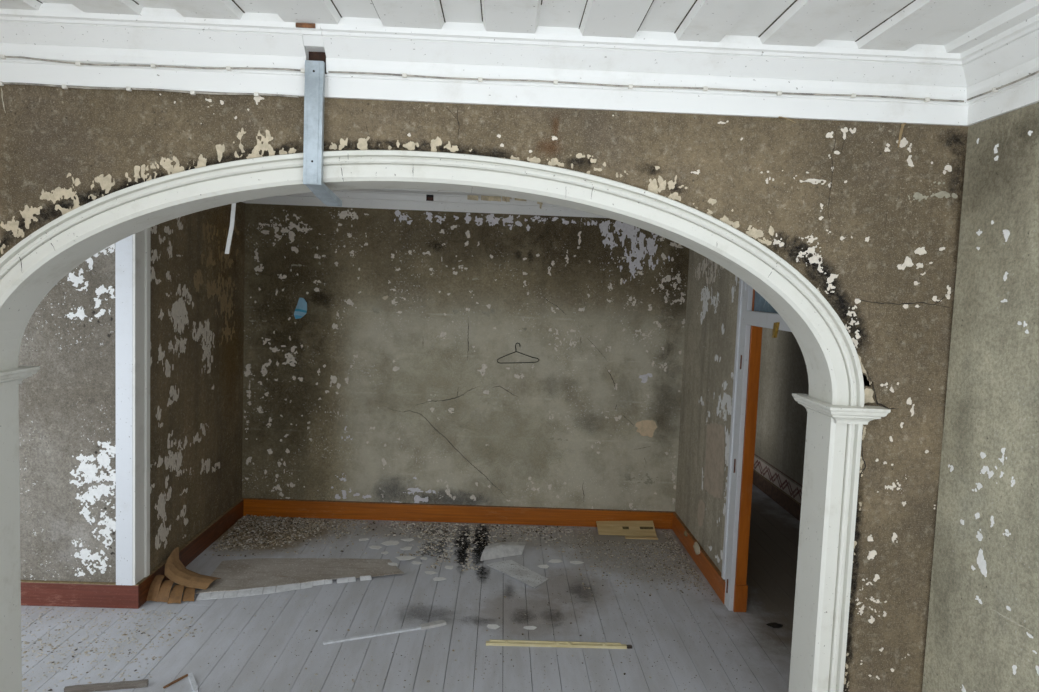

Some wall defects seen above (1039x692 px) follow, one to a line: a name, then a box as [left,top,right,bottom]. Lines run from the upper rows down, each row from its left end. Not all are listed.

peeling [65,243,115,327]
peeling [0,96,301,254]
peeling [254,209,369,329]
peeling [329,133,472,153]
peeling [372,212,737,398]
peeling [648,166,784,247]
peeling [760,127,856,188]
peeling [796,203,869,294]
spalling [845,298,899,405]
peeling [244,331,312,499]
crack [391,386,516,494]
peeling [70,441,116,577]